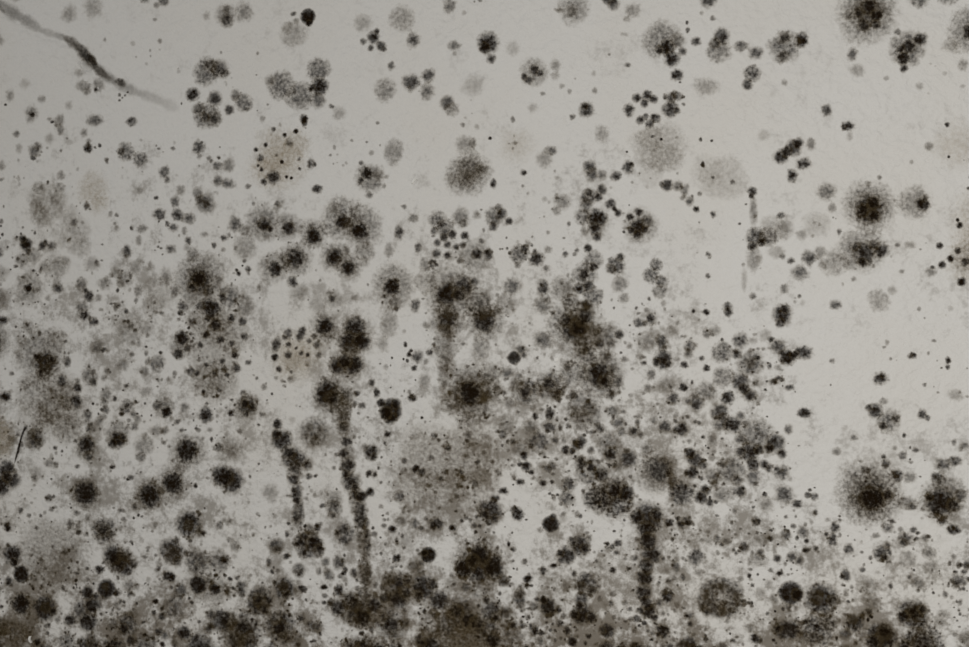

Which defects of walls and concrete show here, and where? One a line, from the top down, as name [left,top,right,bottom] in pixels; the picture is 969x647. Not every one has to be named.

crack [80,46,96,67]
water stain [181,61,258,125]
water stain [292,9,315,26]
water stain [478,35,496,63]
water stain [625,21,699,140]
water stain [712,30,761,89]
water stain [849,0,926,71]
water stain [775,140,810,180]
water stain [857,191,888,223]
water stain [847,455,908,531]
water stain [920,457,964,534]
water stain [716,506,944,647]